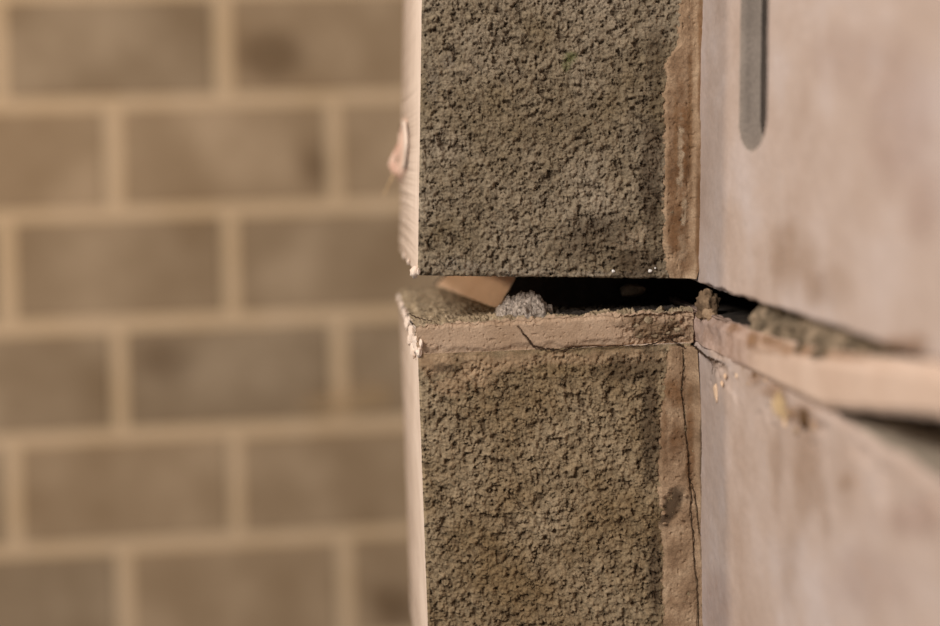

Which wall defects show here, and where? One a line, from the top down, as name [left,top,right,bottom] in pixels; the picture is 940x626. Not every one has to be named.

spalling [397,294,423,359]
crack [518,326,725,626]